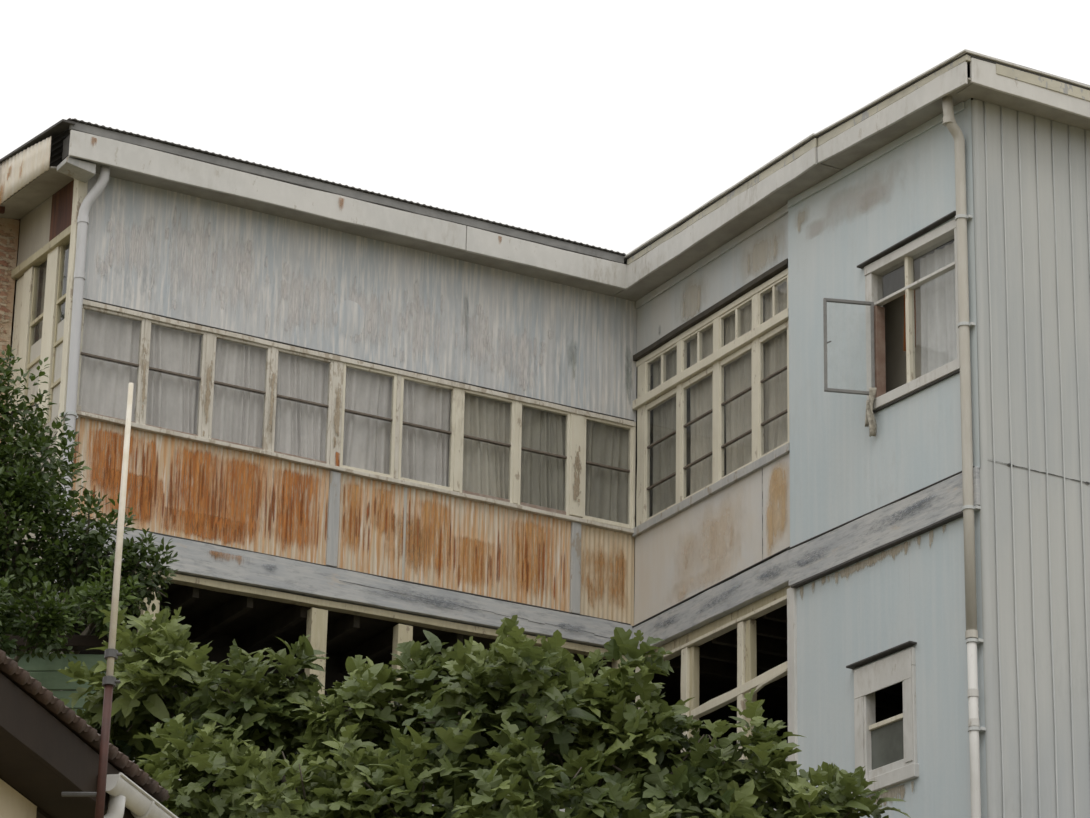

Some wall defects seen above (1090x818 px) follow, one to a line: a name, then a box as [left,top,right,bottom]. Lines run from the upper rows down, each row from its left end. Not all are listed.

corrosion [75,429,328,560]
corrosion [343,485,565,598]
corrosion [582,553,625,600]